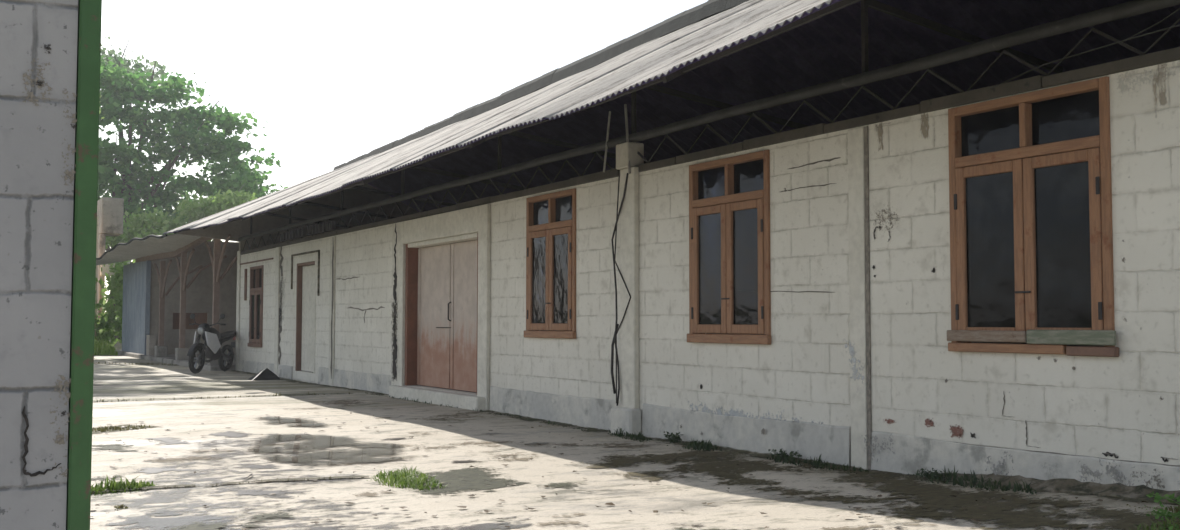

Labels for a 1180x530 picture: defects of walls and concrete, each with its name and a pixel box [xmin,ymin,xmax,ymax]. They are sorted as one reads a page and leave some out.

crack [93,223,399,402]
crack [22,406,61,477]
spalling [950,424,976,438]